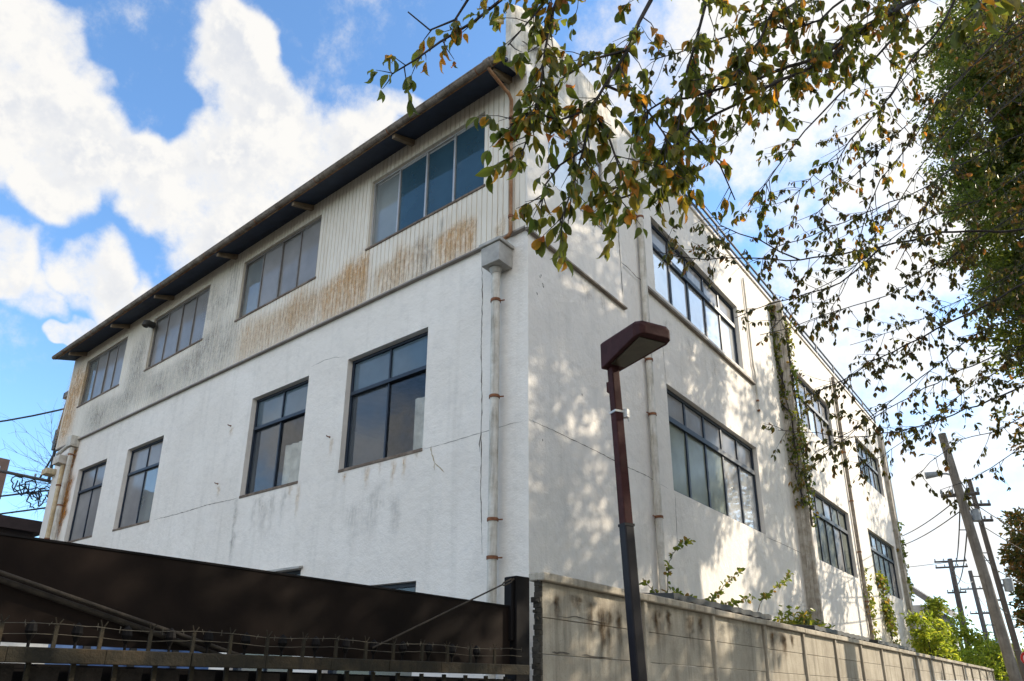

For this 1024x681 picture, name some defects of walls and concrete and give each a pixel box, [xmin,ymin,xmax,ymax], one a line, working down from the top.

crack [425,272,678,543]
leakage [576,598,621,648]